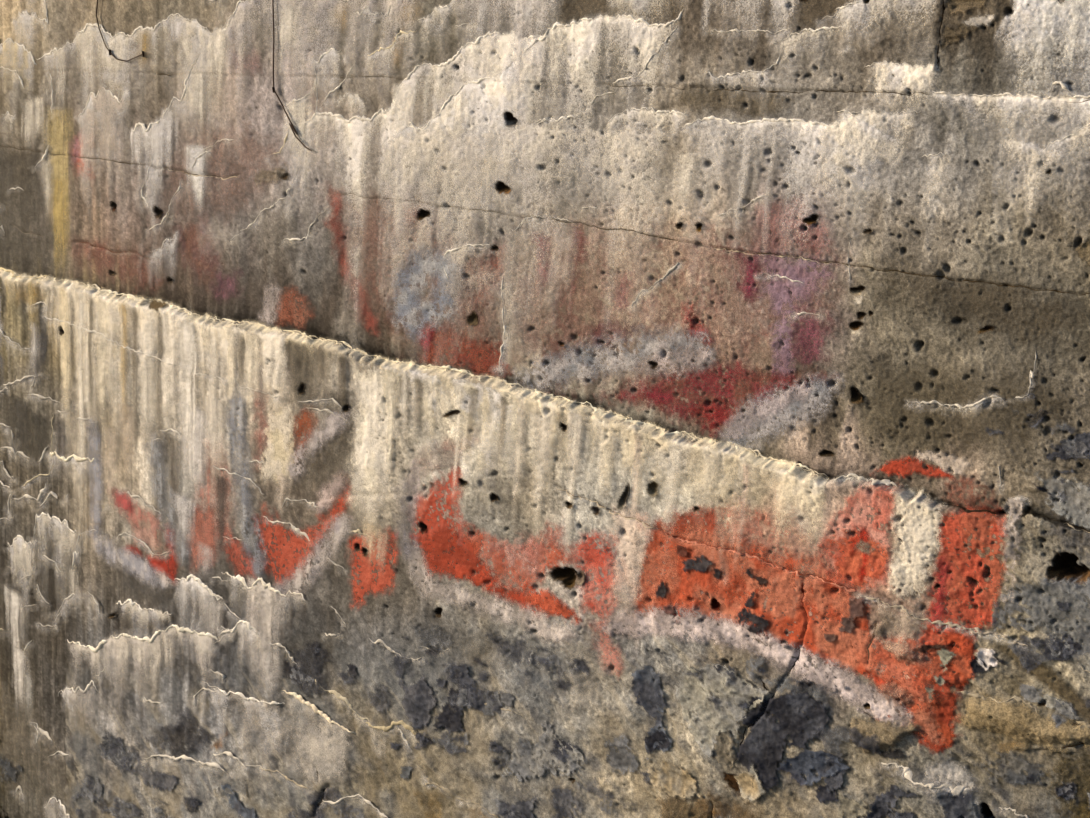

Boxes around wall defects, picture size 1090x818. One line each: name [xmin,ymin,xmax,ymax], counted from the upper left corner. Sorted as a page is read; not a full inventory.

crack [937,0,945,68]
spalling [947,0,985,14]
crack [3,146,239,180]
water stain [0,0,931,293]
crack [604,83,929,96]
water stain [865,0,1090,201]
crack [344,193,1090,295]
water stain [0,139,1090,790]
peeling [1014,410,1090,529]
spalling [549,567,585,589]
peeling [970,499,1090,728]
water stain [881,757,976,804]